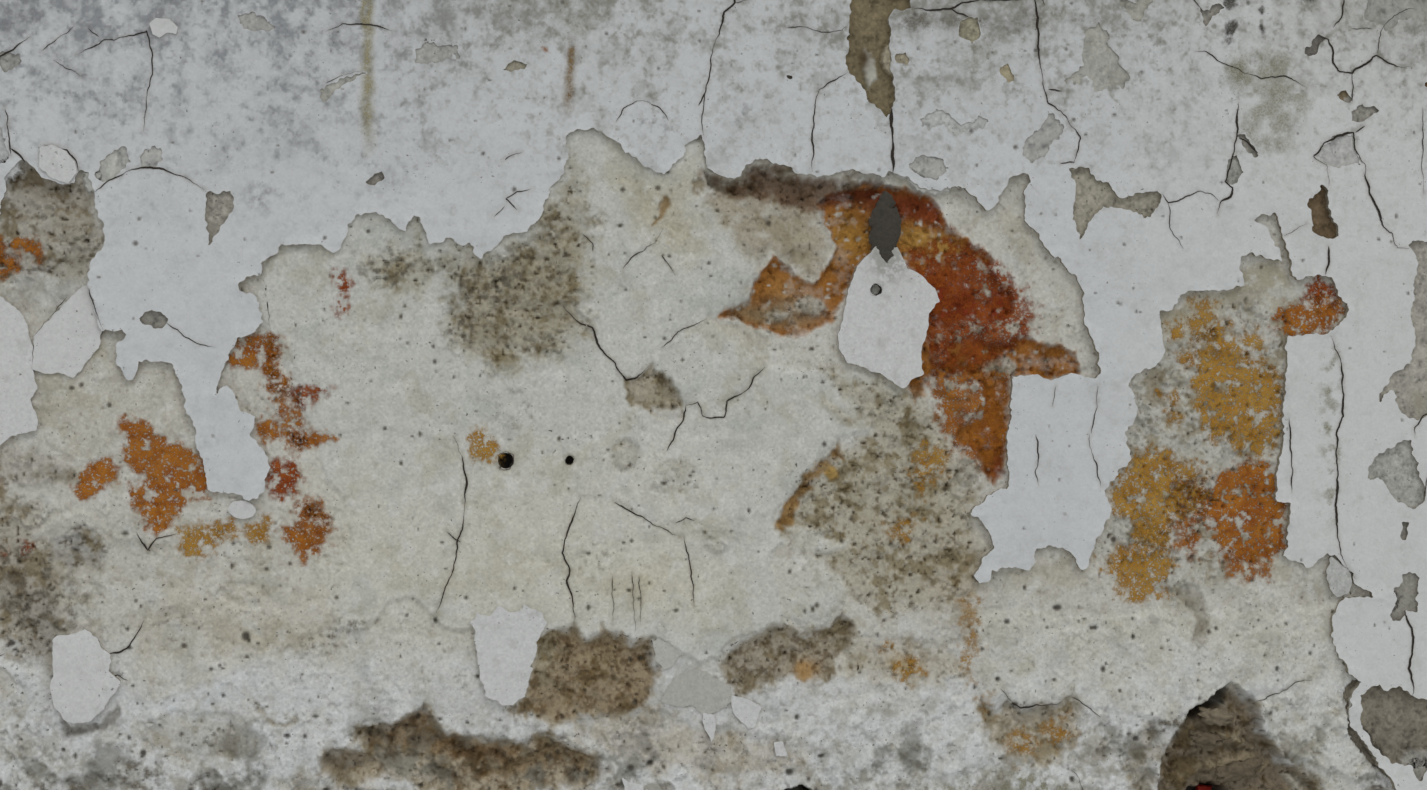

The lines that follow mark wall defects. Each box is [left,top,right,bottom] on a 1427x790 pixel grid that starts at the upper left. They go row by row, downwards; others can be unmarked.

crack [5,111,203,191]
crack [617,0,744,136]
spalling [846,0,910,117]
crack [888,108,896,171]
crack [915,0,1081,164]
crack [1163,51,1305,246]
crack [1314,0,1413,249]
spalling [1379,240,1427,420]
spalling [0,128,1352,790]
spalling [1368,440,1425,540]
spalling [1390,572,1419,621]
spalling [1347,686,1427,781]